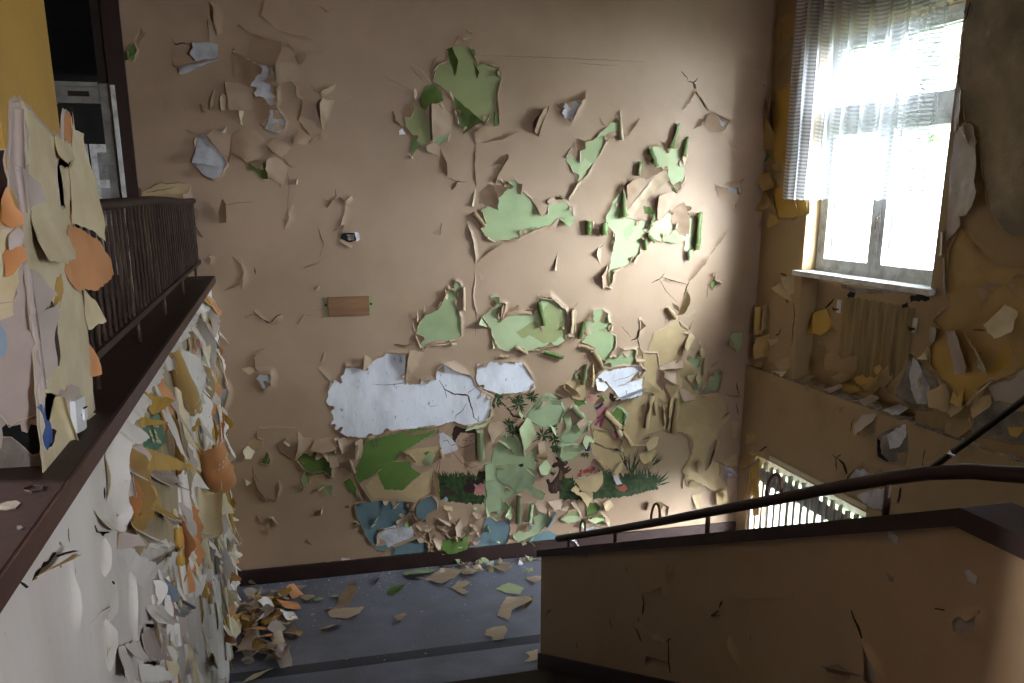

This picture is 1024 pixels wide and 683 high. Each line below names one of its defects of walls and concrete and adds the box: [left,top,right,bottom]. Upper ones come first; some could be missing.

peeling [0,95,114,510]
spalling [65,0,742,683]
crack [680,71,711,111]
peeling [753,264,795,380]
peeling [806,83,1024,469]